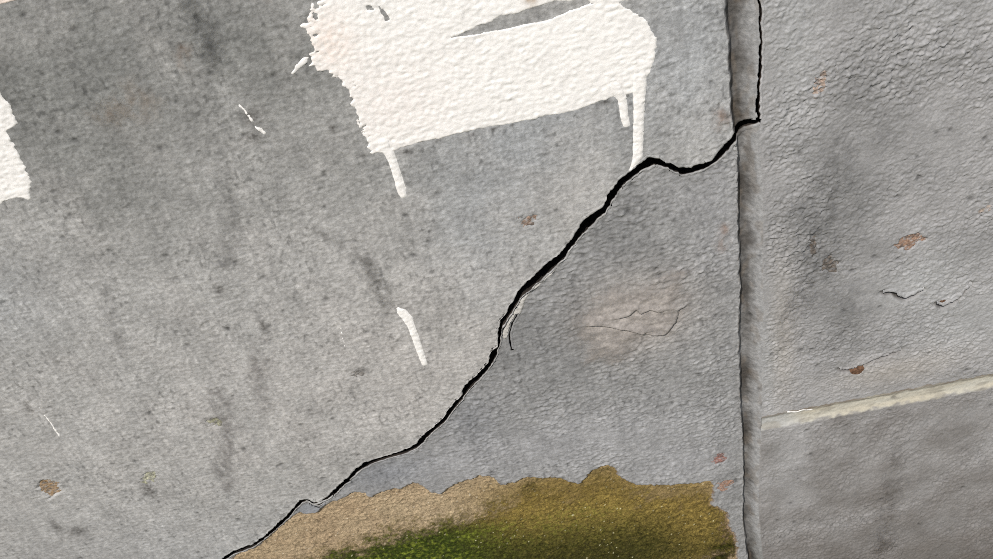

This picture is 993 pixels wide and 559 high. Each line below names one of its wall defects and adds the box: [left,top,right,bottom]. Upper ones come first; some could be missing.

crack [220,0,766,559]
spalling [894,232,926,250]
peeling [839,347,901,375]
flaking render [234,465,738,559]